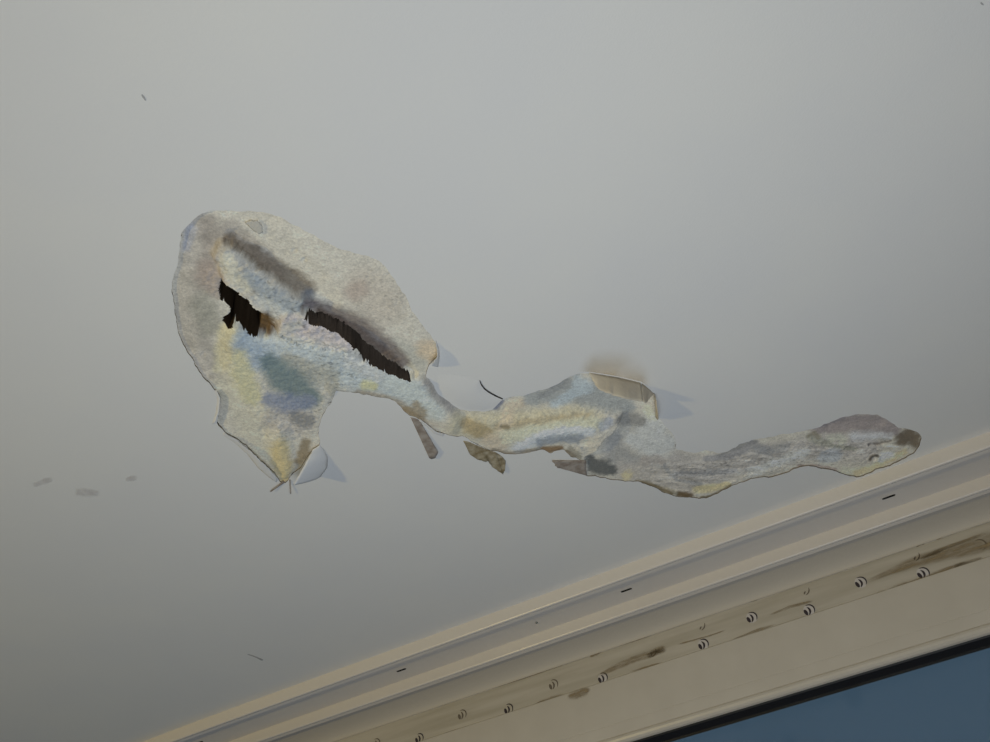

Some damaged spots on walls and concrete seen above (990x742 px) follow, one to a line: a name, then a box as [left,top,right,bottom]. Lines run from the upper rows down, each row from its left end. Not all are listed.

flaking render [172,210,916,498]